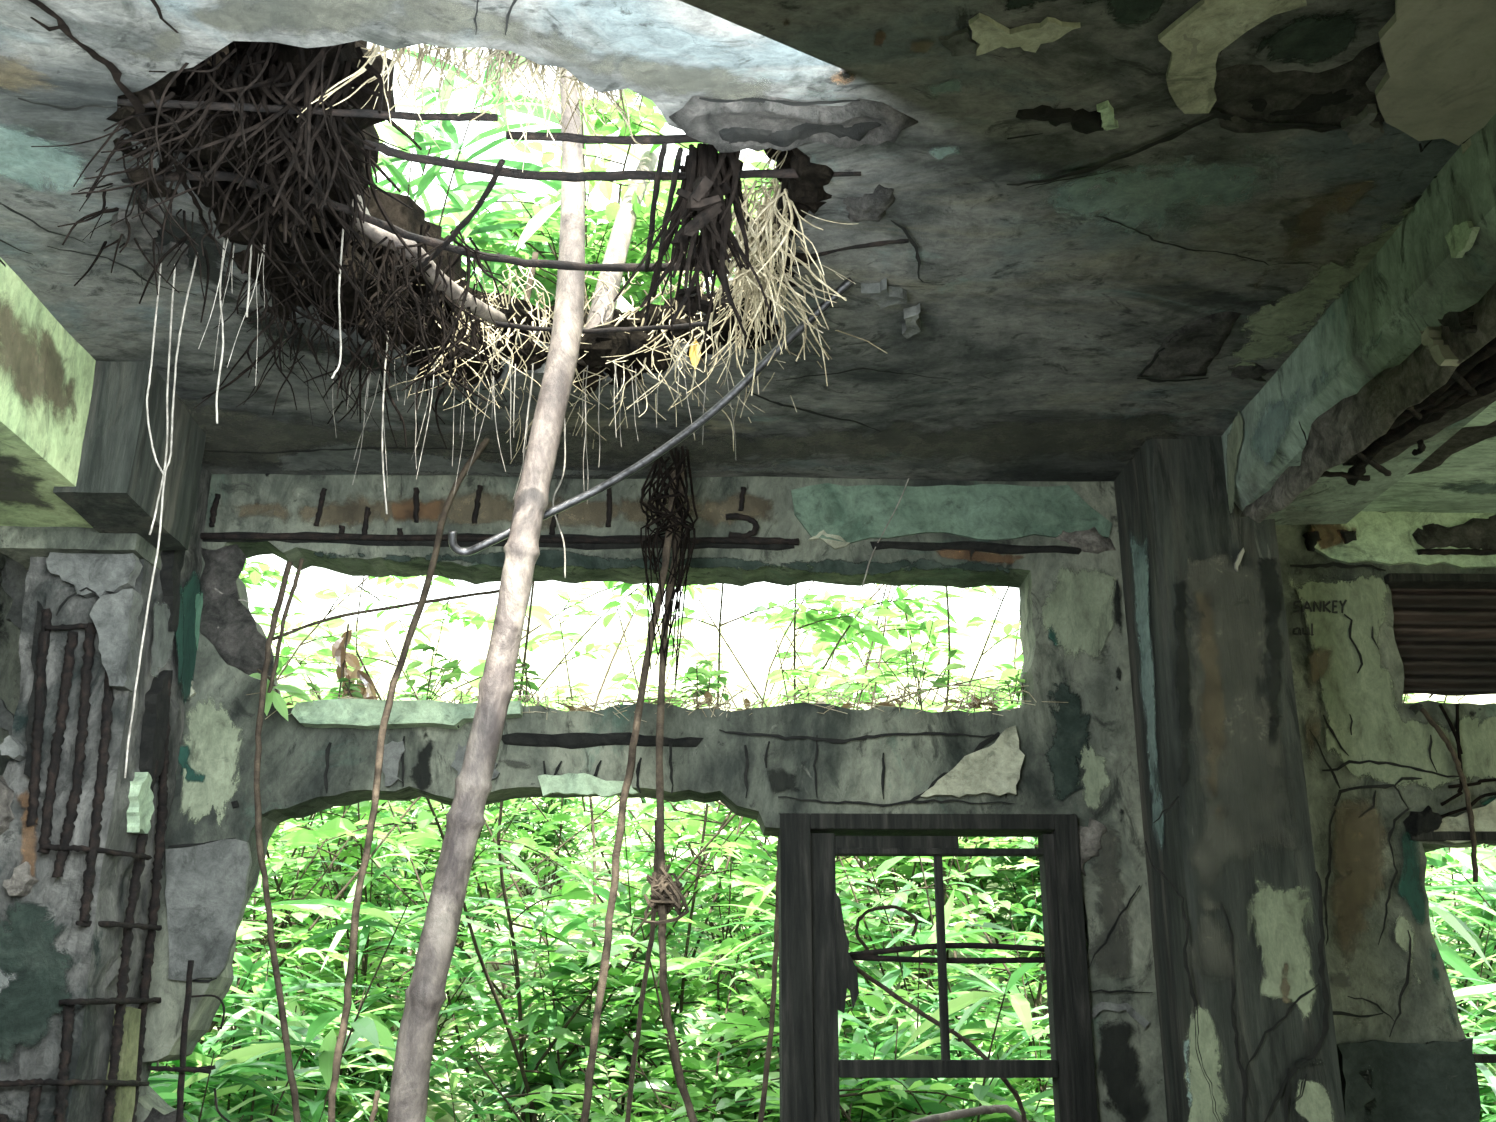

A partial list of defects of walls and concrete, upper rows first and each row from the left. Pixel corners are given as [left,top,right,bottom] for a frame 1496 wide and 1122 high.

crack [18,0,215,241]
flaking render [1158,0,1496,146]
crack [0,203,196,295]
spalling [111,95,921,371]
water stain [0,301,77,420]
spalling [1226,282,1496,523]
crack [1344,614,1379,673]
flaking render [0,443,523,1122]
spalling [911,725,1025,800]
crack [1088,714,1459,1122]
peeling [1248,880,1394,1021]
water stain [1331,798,1388,962]